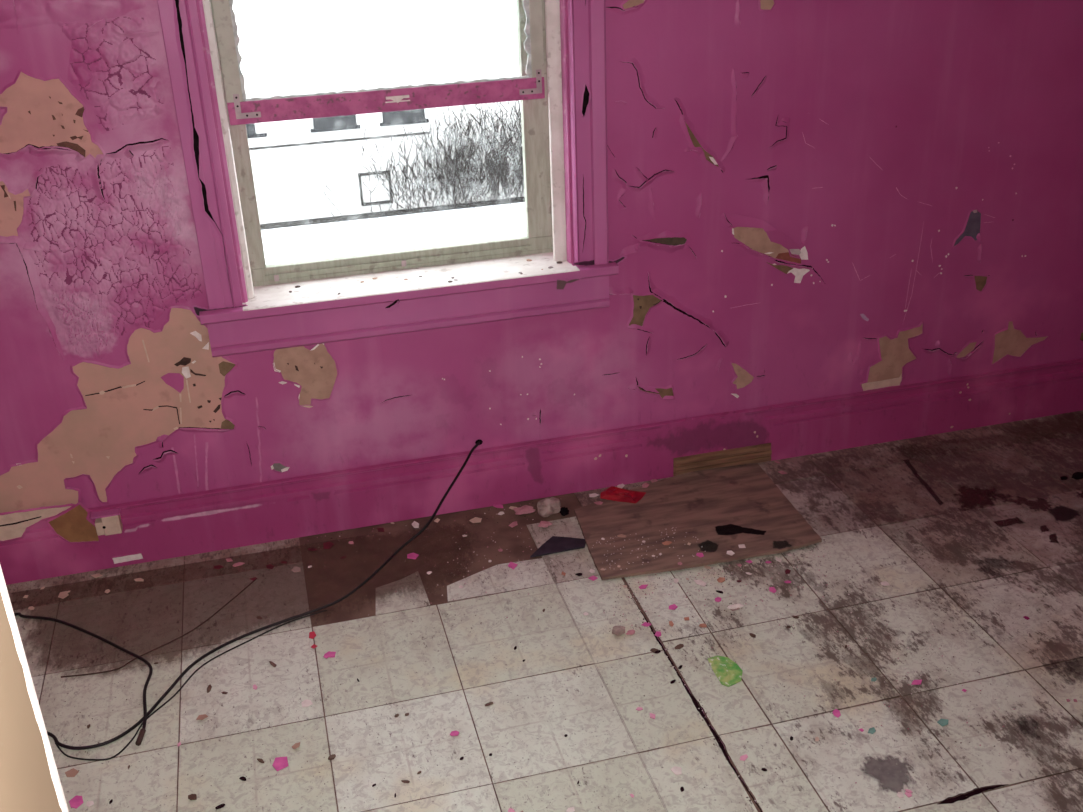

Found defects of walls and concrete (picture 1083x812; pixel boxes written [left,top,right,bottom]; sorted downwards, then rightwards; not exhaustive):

peeling [0,69,106,164]
crack [0,0,234,307]
crack [578,174,586,253]
peeling [724,213,813,283]
peeling [626,293,664,330]
peeling [271,343,339,408]
peeling [860,321,924,391]
peeling [0,305,239,544]
leakage [903,459,1083,543]
peeling [111,552,145,565]
leakage [978,556,1013,576]
spalling [0,565,94,812]